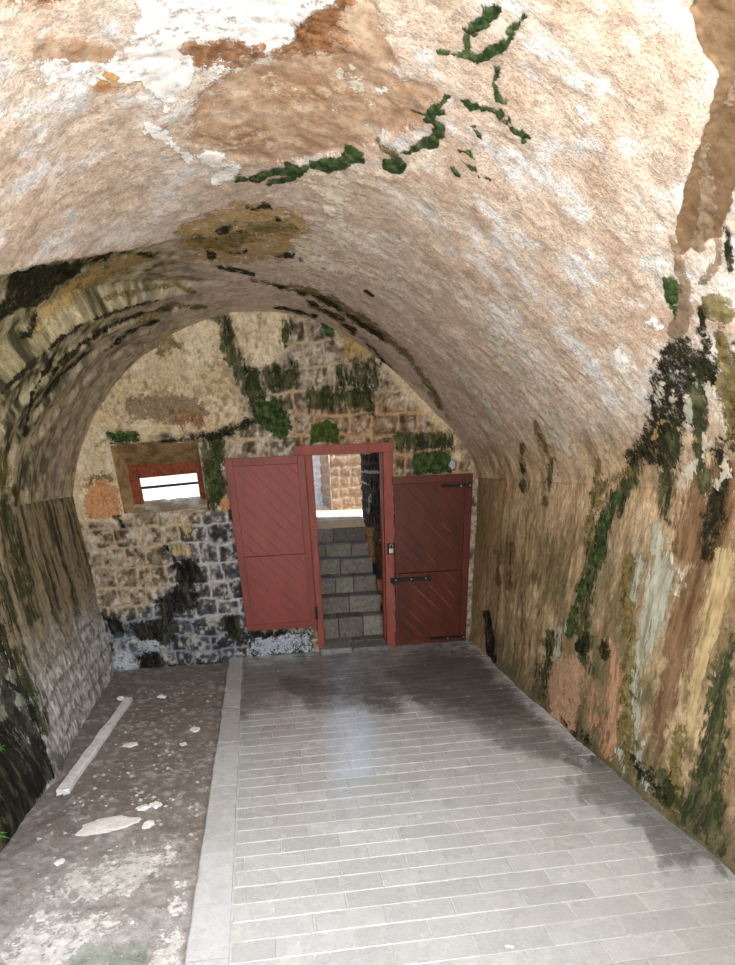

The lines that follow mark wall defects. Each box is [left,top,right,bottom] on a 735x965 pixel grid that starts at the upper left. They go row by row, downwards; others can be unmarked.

flaking render [0,0,61,10]
flaking render [29,0,446,186]
water stain [559,0,735,835]
water stain [0,499,68,849]
water stain [106,525,224,670]
water stain [554,617,567,660]